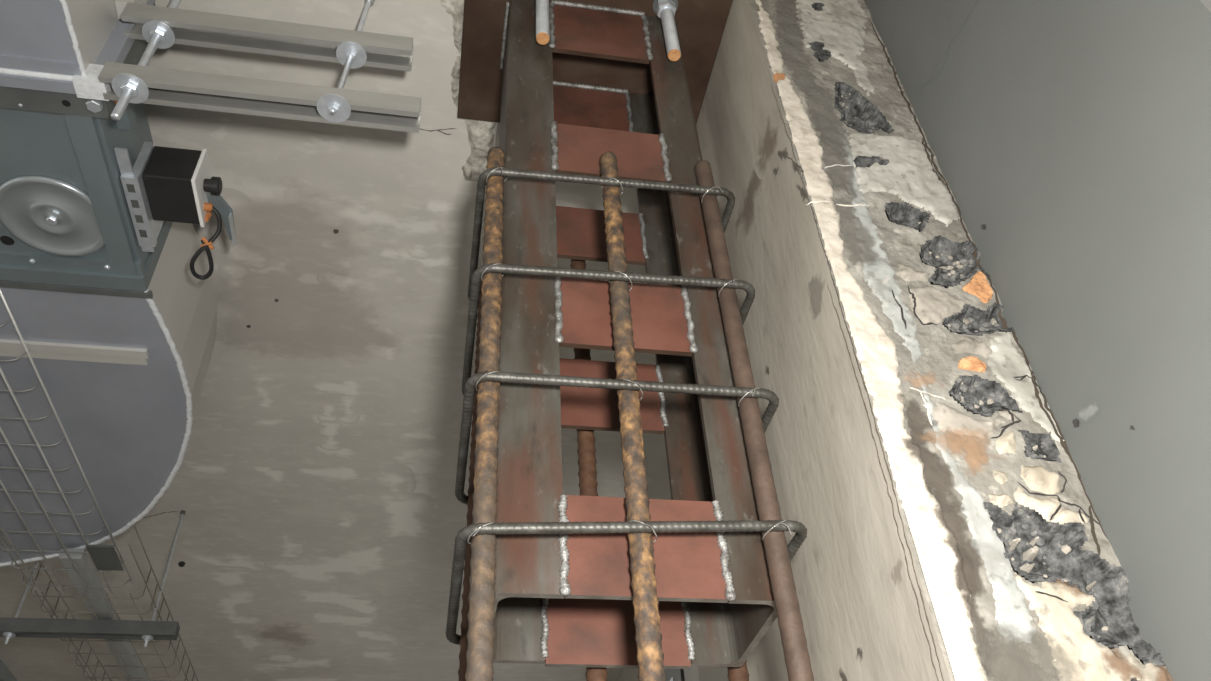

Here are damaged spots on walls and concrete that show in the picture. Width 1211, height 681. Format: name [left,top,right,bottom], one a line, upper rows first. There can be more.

spalling [440,0,496,182]
peeling [756,0,1167,681]
crack [869,19,1107,555]